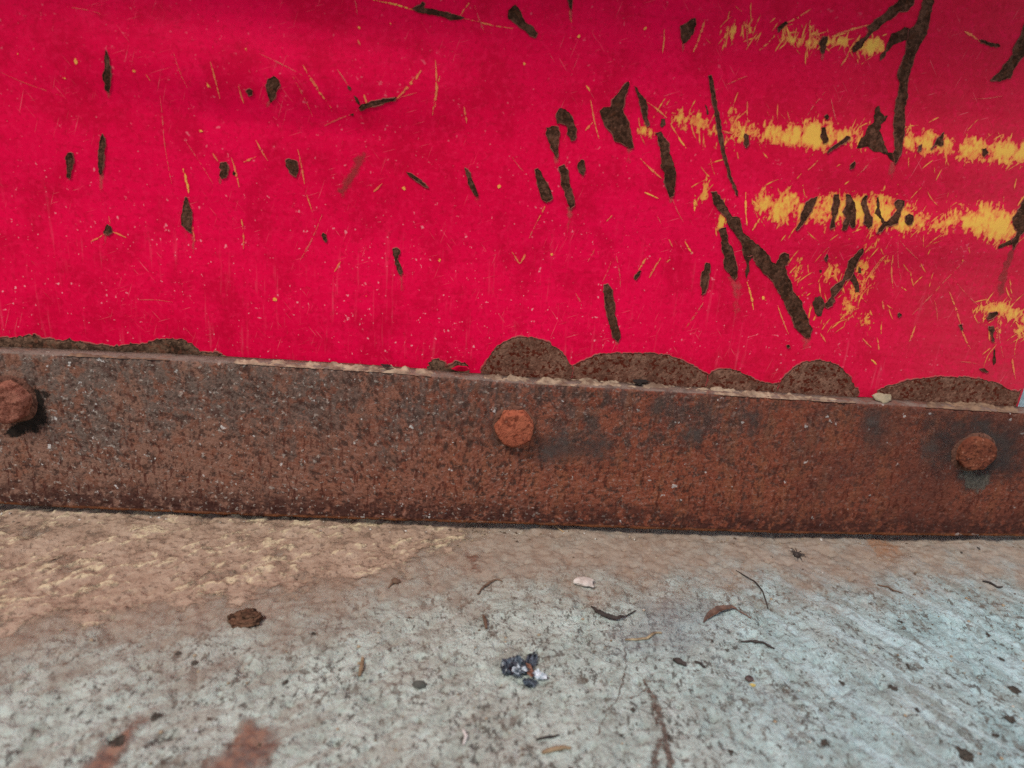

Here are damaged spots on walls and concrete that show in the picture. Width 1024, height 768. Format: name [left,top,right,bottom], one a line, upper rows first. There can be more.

peeling [102,50,112,95]
peeling [98,134,106,184]
peeling [181,197,194,245]
peeling [534,108,586,217]
peeling [600,0,1024,345]
peeling [0,280,1024,413]
corrosion [0,346,1024,618]